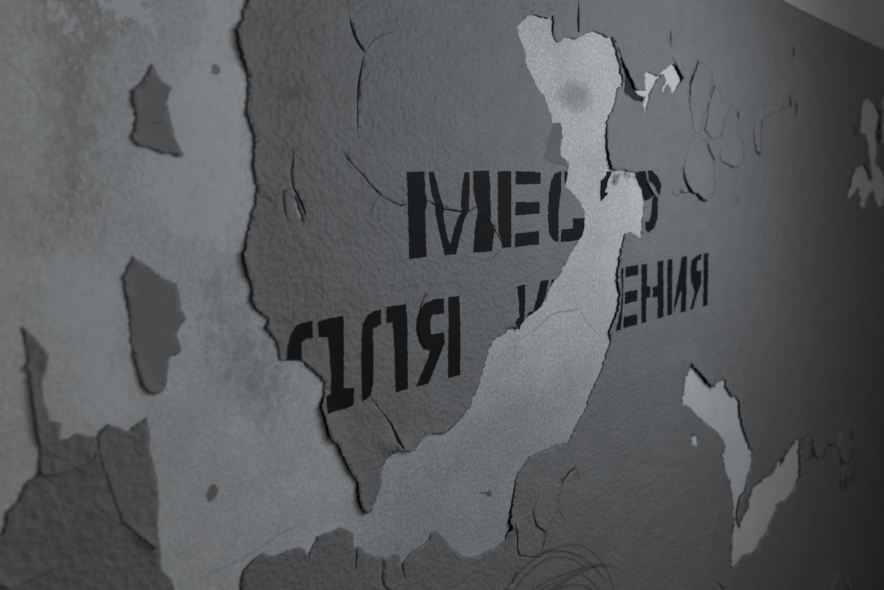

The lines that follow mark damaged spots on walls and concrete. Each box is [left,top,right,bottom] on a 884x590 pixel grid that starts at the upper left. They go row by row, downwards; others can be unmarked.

crack [349,16,365,130]
peeling [635,65,680,112]
crack [283,157,305,222]
peeling [848,97,884,208]
peeling [0,0,659,590]
peeling [682,366,799,567]